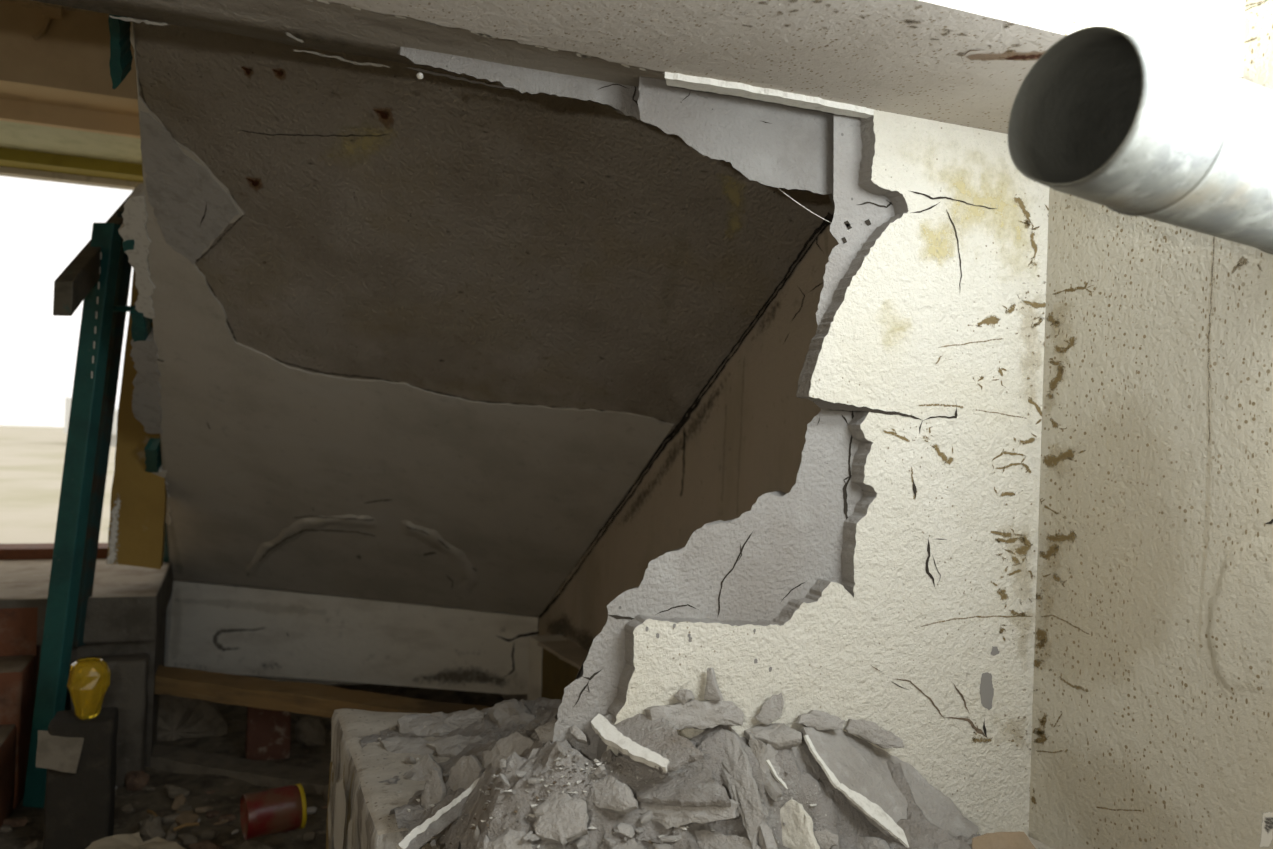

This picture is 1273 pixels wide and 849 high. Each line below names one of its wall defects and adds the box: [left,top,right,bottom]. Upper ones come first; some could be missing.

peeling [108,14,168,108]
peeling [287,32,390,68]
corrosion [961,50,1044,62]
damp [956,181,1040,277]
peeling [118,184,172,562]
crack [497,191,997,676]
damp [883,427,953,465]
damp [919,280,1094,692]
peeling [107,498,121,565]
crack [574,670,601,706]
crack [872,666,992,743]
damp [997,711,1068,753]